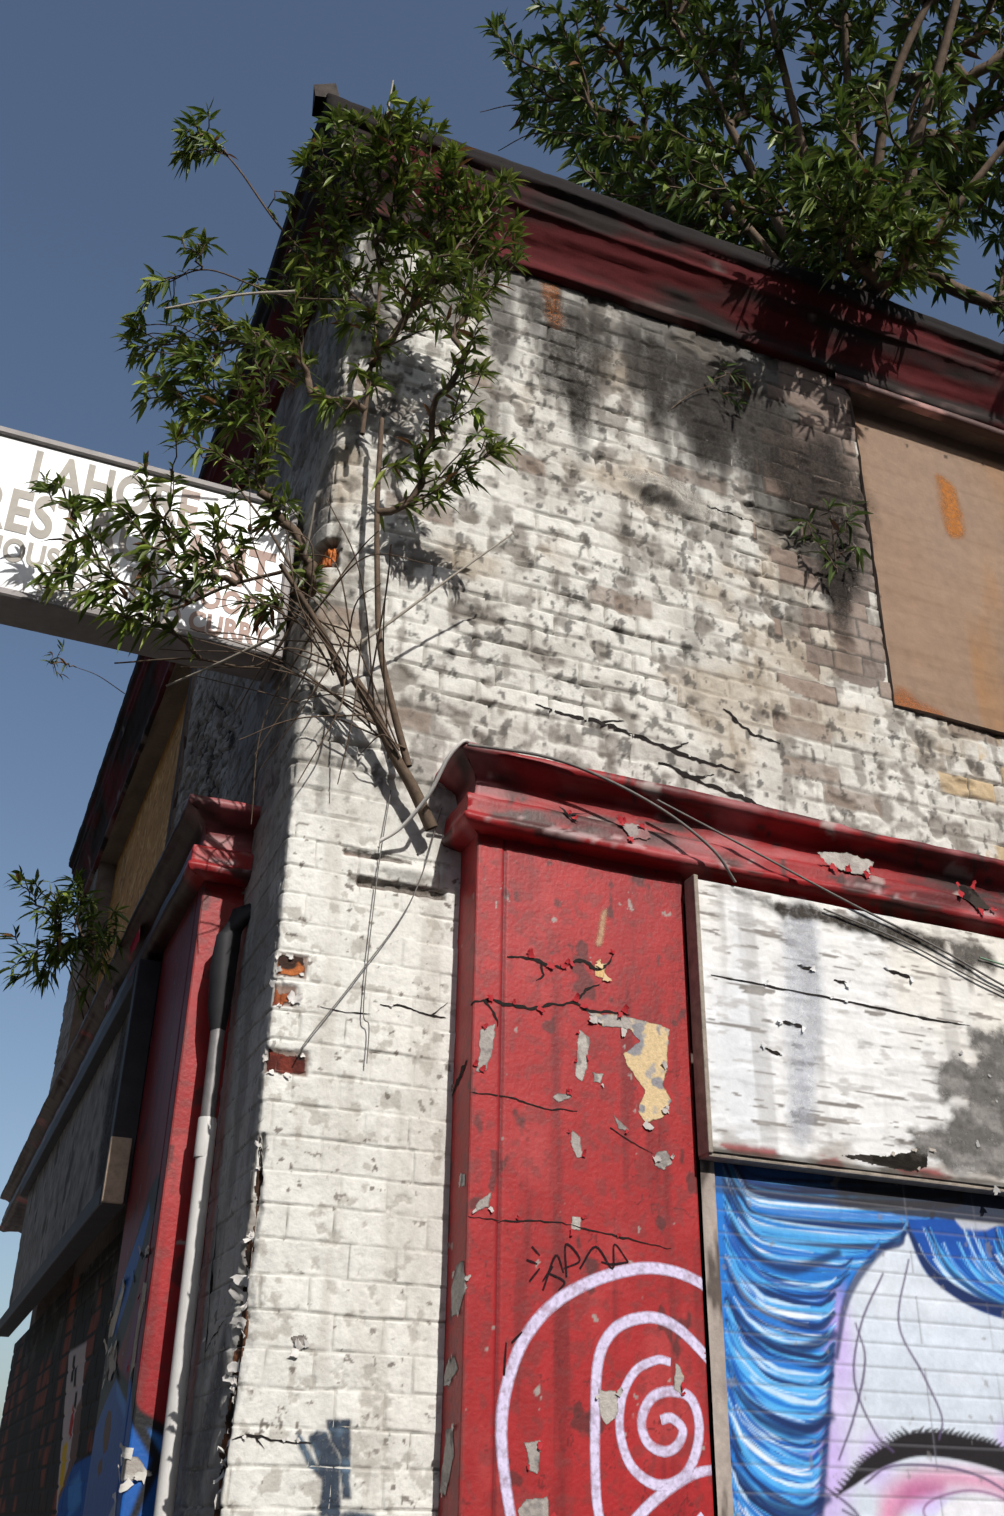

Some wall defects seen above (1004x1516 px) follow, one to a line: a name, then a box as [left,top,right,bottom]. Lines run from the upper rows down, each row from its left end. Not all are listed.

flaking render [269,951,305,1007]
flaking render [262,1040,306,1079]
peeling [553,1012,672,1133]
peeling [568,1130,586,1158]
peeling [653,1150,675,1170]
leakage [914,1028,1004,1195]
peeling [102,1276,147,1389]
crack [202,1137,311,1516]
peeling [112,1443,152,1516]